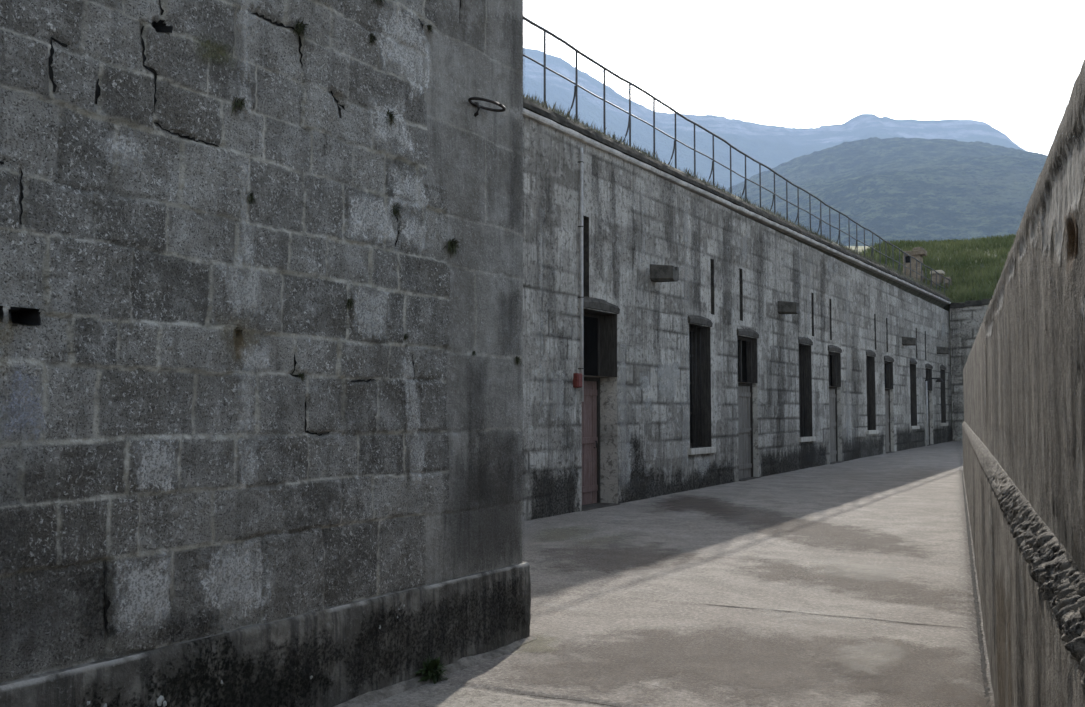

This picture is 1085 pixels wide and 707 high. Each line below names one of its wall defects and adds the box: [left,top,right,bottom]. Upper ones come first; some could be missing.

crack [48,37,68,92]
crack [94,79,102,104]
crack [141,4,219,147]
crack [247,9,303,66]
crack [0,161,24,224]
water stain [983,63,1085,326]
water stain [618,341,735,504]
water stain [530,468,580,520]
water stain [695,500,925,557]
water stain [76,546,270,645]
water stain [740,559,975,614]
mould [269,579,525,690]